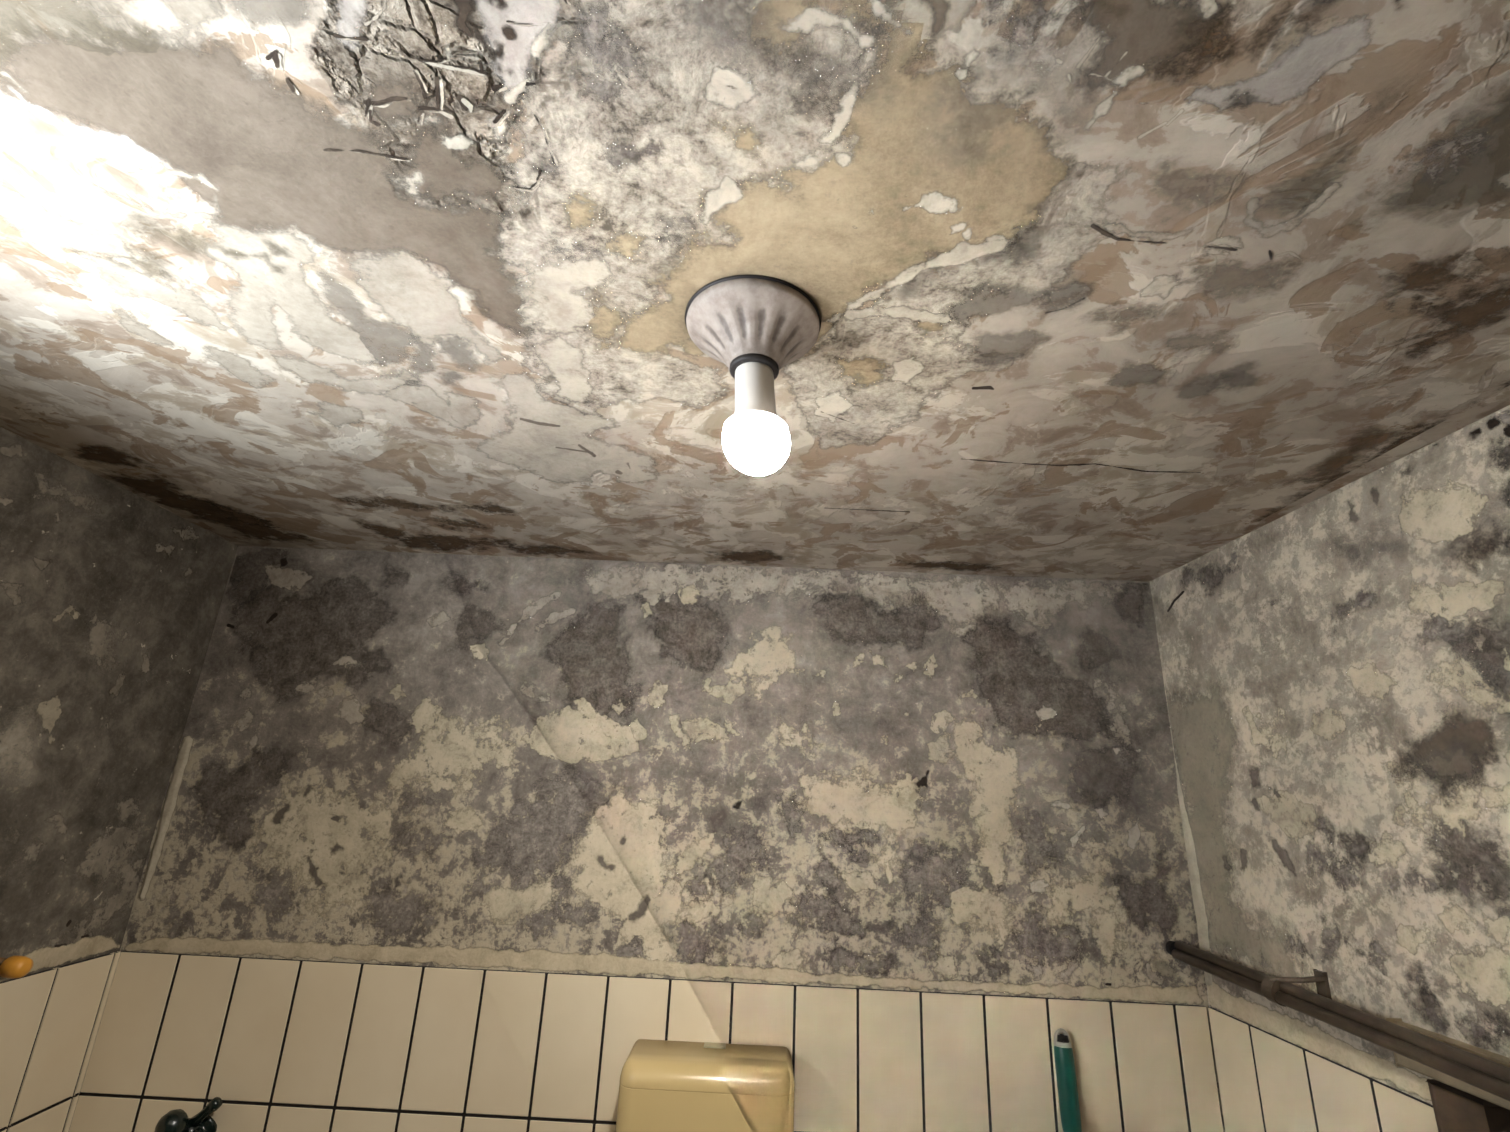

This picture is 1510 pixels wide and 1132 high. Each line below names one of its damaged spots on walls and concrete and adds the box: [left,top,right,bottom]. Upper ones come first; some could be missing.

peeling [0,0,1128,484]
peeling [265,558,313,591]
peeling [52,604,150,696]
damp [227,548,412,745]
peeling [249,678,740,920]
damp [546,593,729,716]
peeling [702,626,826,705]
peeling [752,874,794,919]
damp [963,615,1138,811]
damp [1167,687,1391,989]
damp [1399,713,1499,795]
damp [1388,819,1510,917]